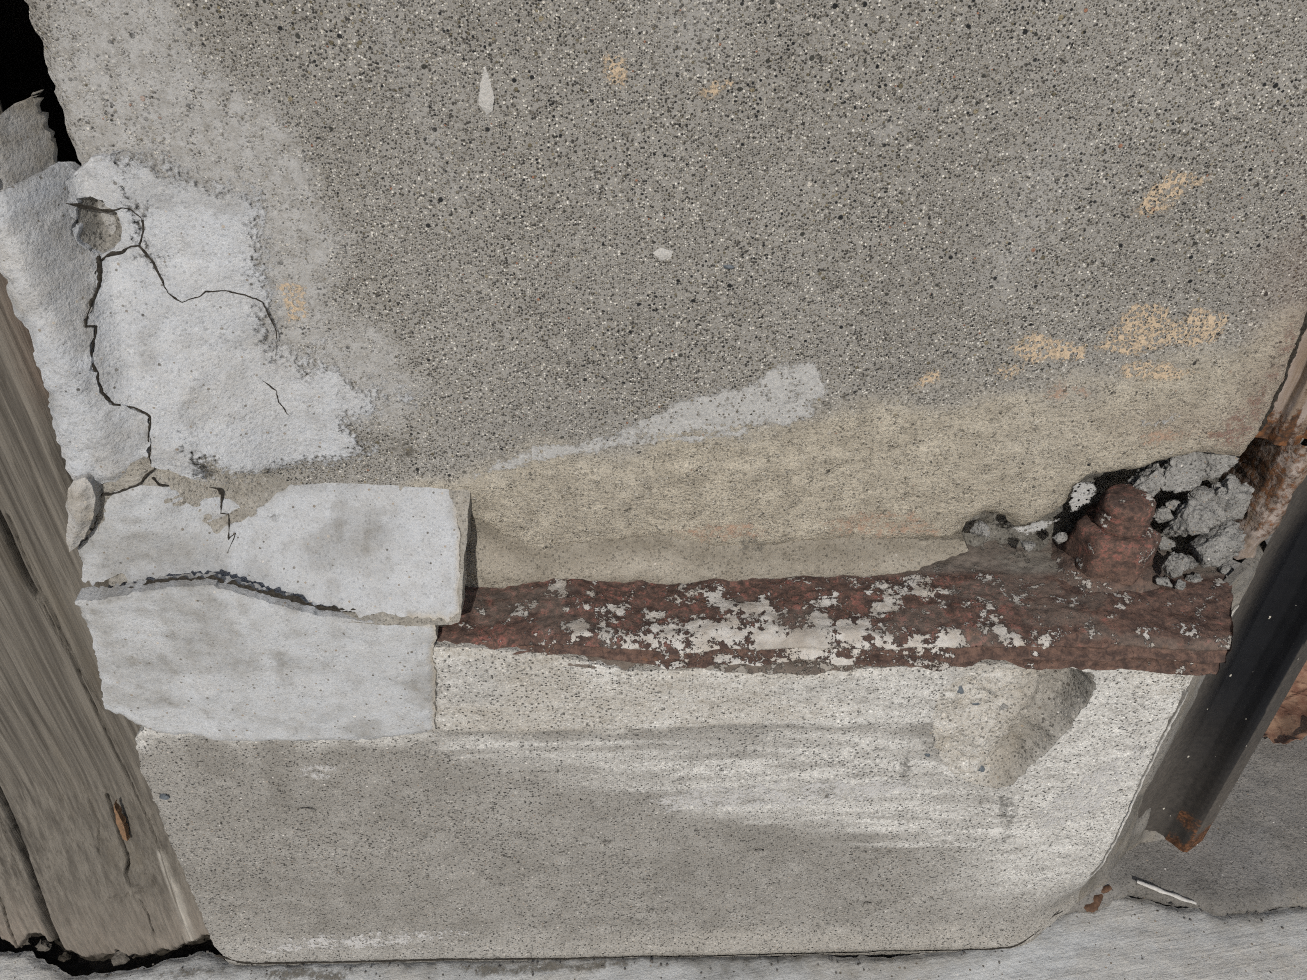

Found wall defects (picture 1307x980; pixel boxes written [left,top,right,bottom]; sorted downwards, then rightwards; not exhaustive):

spalling [78,196,122,253]
crack [66,203,288,496]
peeling [65,473,103,552]
crack [127,487,356,612]
spalling [962,461,1157,551]
spalling [1150,456,1240,553]